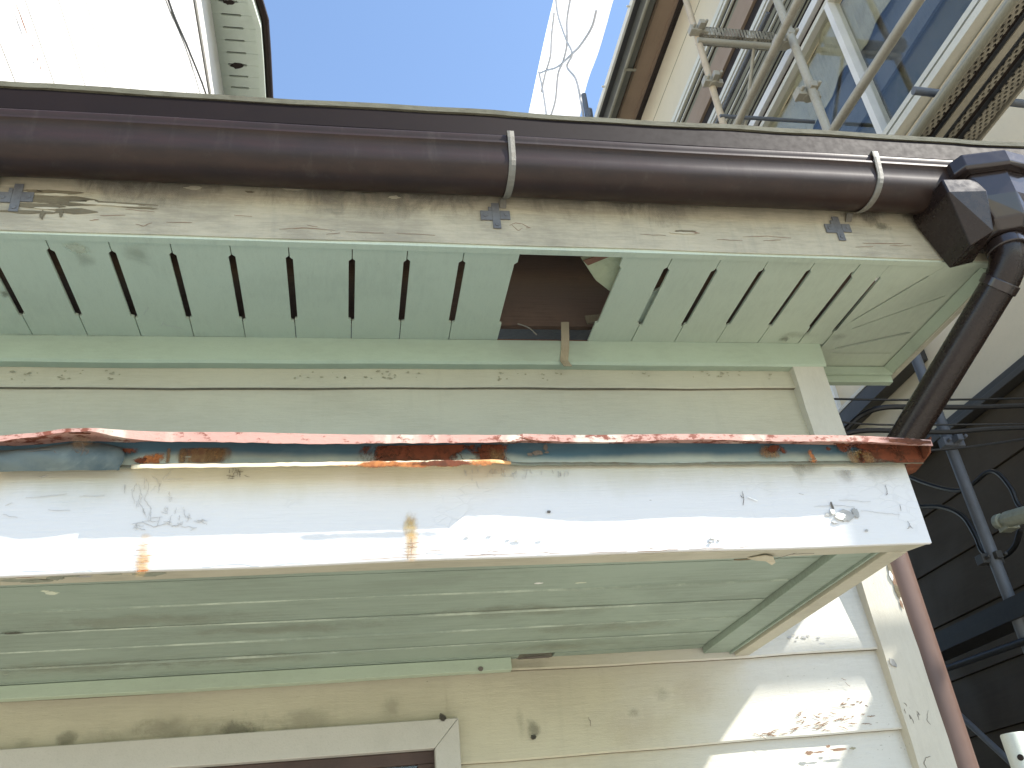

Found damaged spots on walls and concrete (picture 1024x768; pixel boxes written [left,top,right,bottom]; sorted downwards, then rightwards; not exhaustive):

peeling [0,189,158,219]
corrosion [122,448,226,464]
corrosion [345,444,508,468]
corrosion [761,445,786,458]
corrosion [826,438,931,463]
crack [3,472,207,530]